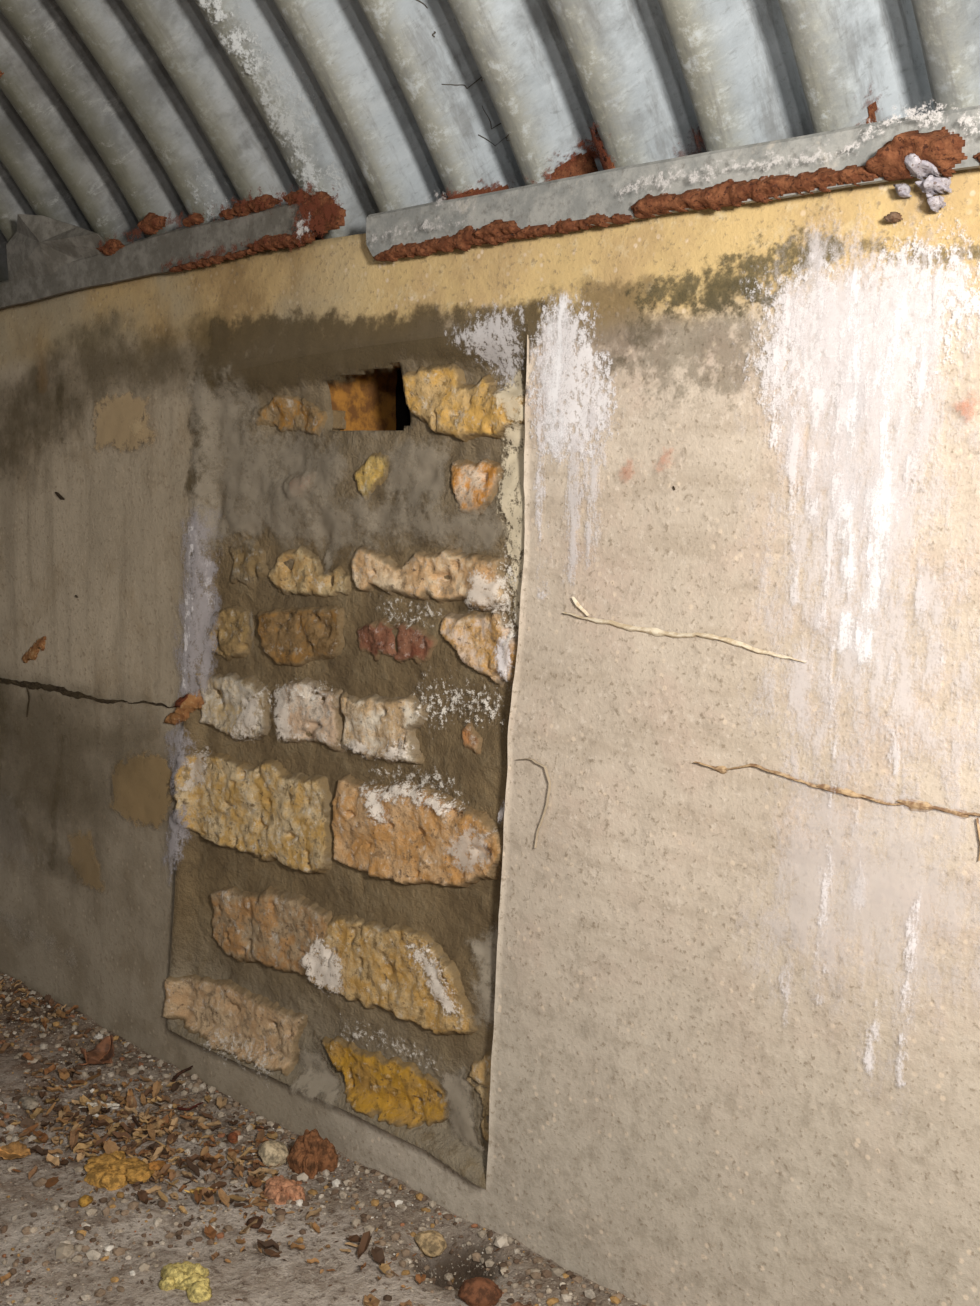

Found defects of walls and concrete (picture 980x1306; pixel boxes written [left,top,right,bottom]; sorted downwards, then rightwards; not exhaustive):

rust [527,123,615,182]
rust [866,101,878,124]
rust [96,182,346,272]
rust [373,165,879,262]
water stain [175,294,618,730]
water stain [626,214,980,776]
crack [0,678,172,717]
water stain [231,681,333,740]
water stain [339,738,469,826]
crack [694,761,980,861]
water stain [300,935,343,993]
water stain [405,943,460,1017]